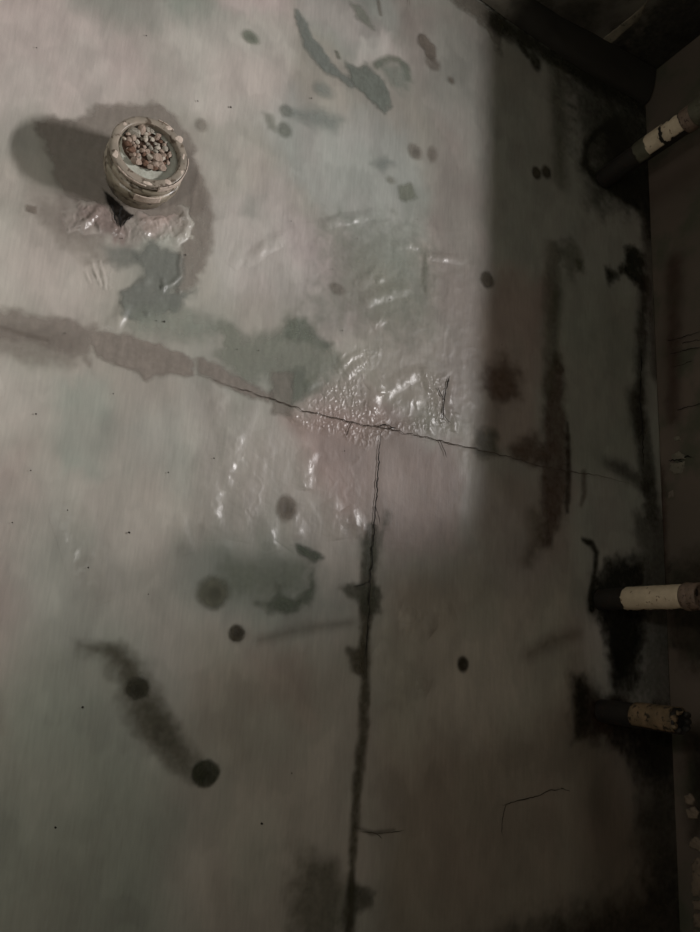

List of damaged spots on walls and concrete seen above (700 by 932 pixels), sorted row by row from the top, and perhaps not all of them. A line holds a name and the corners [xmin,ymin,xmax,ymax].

leakage [296,10,409,112]
leakage [419,34,439,67]
leakage [0,105,338,415]
leakage [454,0,700,706]
leakage [278,497,295,519]
leakage [268,582,314,613]
leakage [296,545,322,561]
crack [210,376,639,680]
leakage [95,648,219,787]